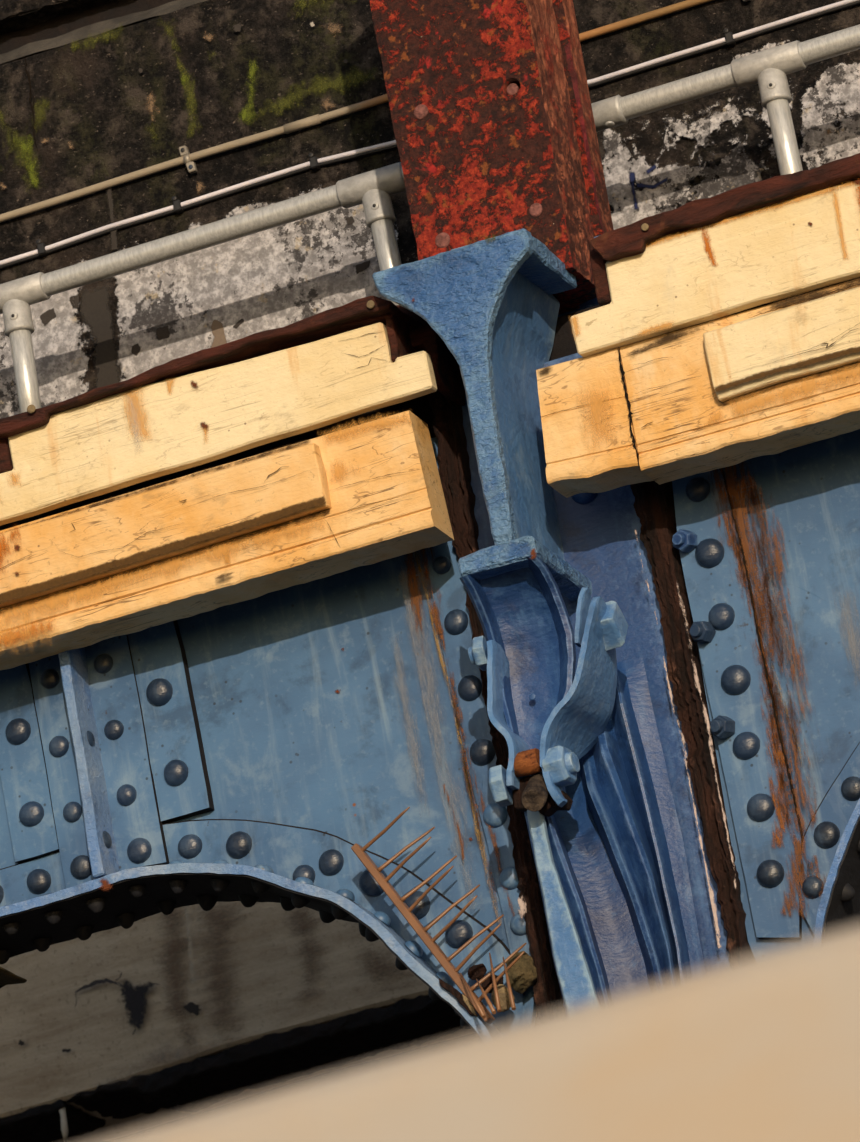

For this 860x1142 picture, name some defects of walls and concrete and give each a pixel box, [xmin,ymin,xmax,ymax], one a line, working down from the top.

peeling [0,314,20,419]
peeling [30,286,93,408]
peeling [114,202,386,382]
crack [543,347,695,471]
peeling [602,96,777,230]
rust [588,153,860,306]
peeling [733,40,789,60]
peeling [789,62,860,170]
rust [711,461,826,918]
rust [404,547,565,1017]